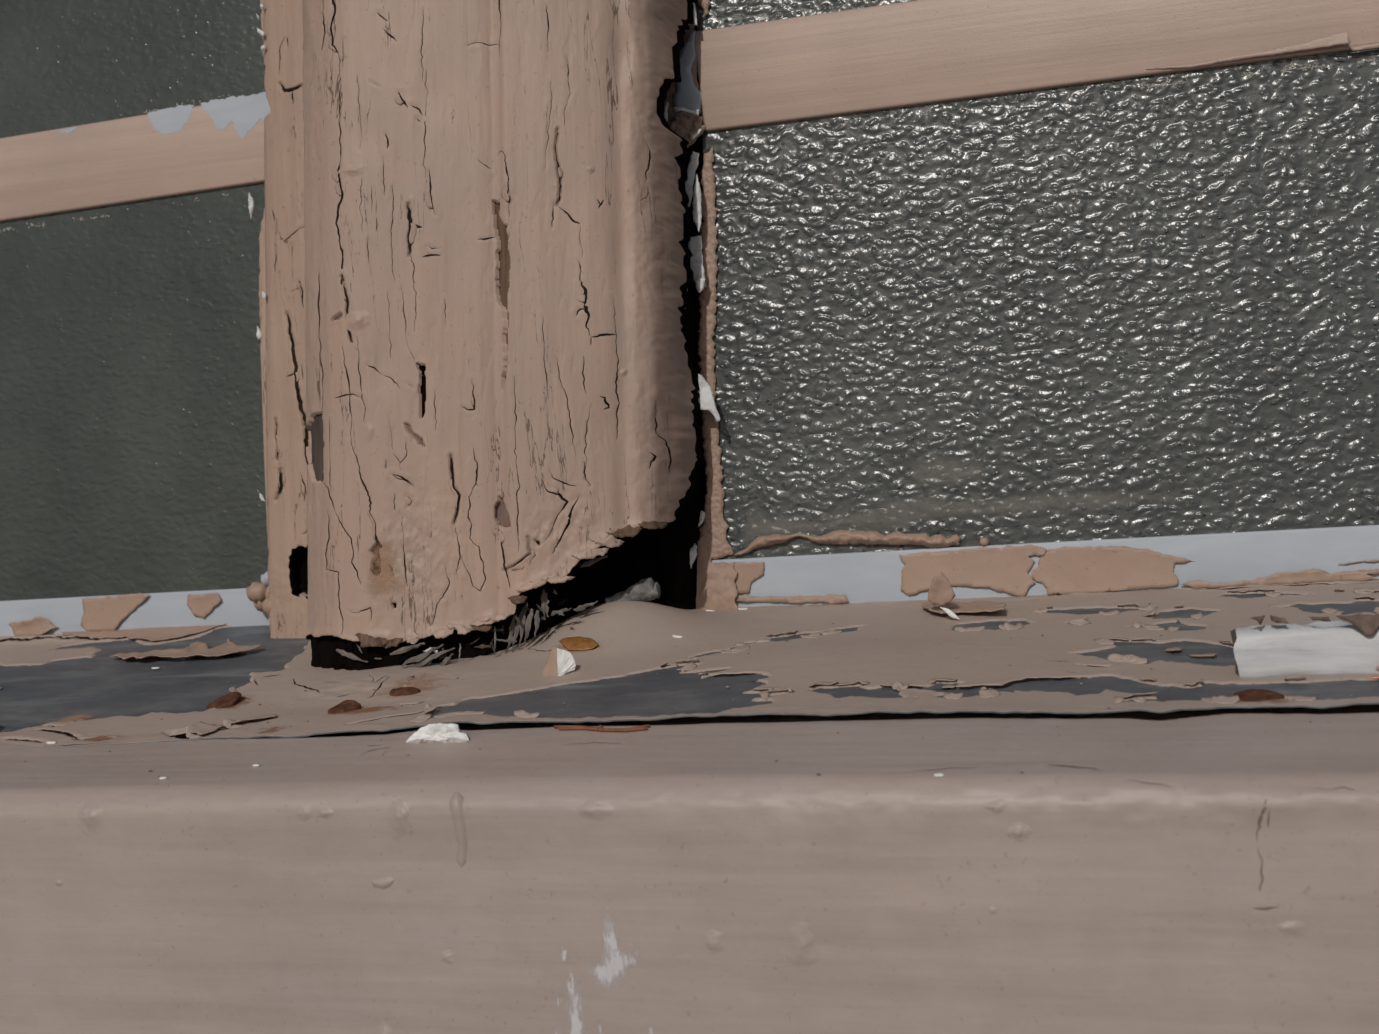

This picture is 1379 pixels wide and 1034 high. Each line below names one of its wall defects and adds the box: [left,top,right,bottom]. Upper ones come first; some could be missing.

crack [469,0,501,53]
peeling [148,92,271,138]
crack [643,147,651,199]
peeling [664,102,706,293]
crack [272,0,475,635]
crack [432,8,620,624]
crack [649,401,672,476]
peeling [698,374,720,422]
peeling [690,510,705,568]
peeling [0,593,311,732]
peeling [406,545,1379,744]
damp [555,917,637,1034]